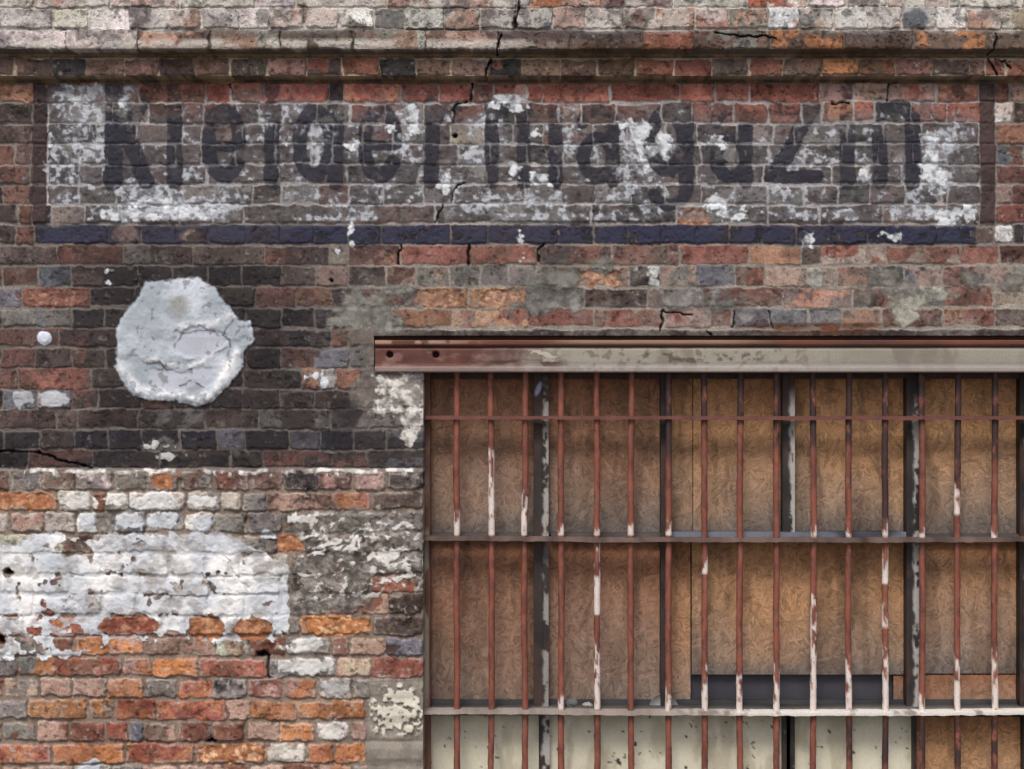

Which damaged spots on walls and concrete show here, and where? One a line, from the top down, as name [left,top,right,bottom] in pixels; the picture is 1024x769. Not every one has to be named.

crack [714,31,773,39]
crack [452,0,520,124]
crack [986,37,1010,76]
peeling [919,130,950,143]
spalling [677,207,710,226]
crack [660,310,735,335]
flaking render [371,372,423,447]
crack [0,450,93,468]
peeling [0,495,302,661]
flaking render [369,683,423,737]